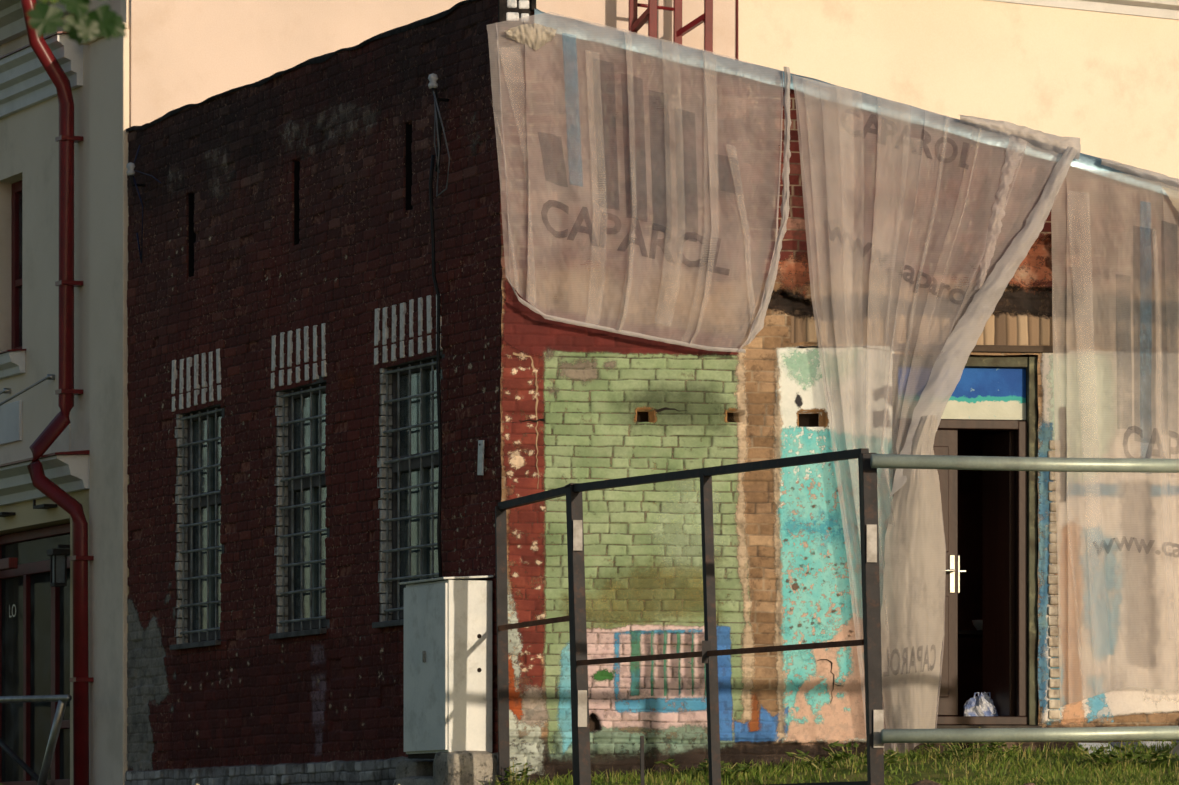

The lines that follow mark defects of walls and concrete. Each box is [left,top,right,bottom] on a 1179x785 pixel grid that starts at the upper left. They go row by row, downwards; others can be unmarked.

spalling [760,251,980,320]
spalling [992,234,1179,327]
damp [586,484,717,625]
peeling [453,280,893,780]
flaking render [127,598,249,772]